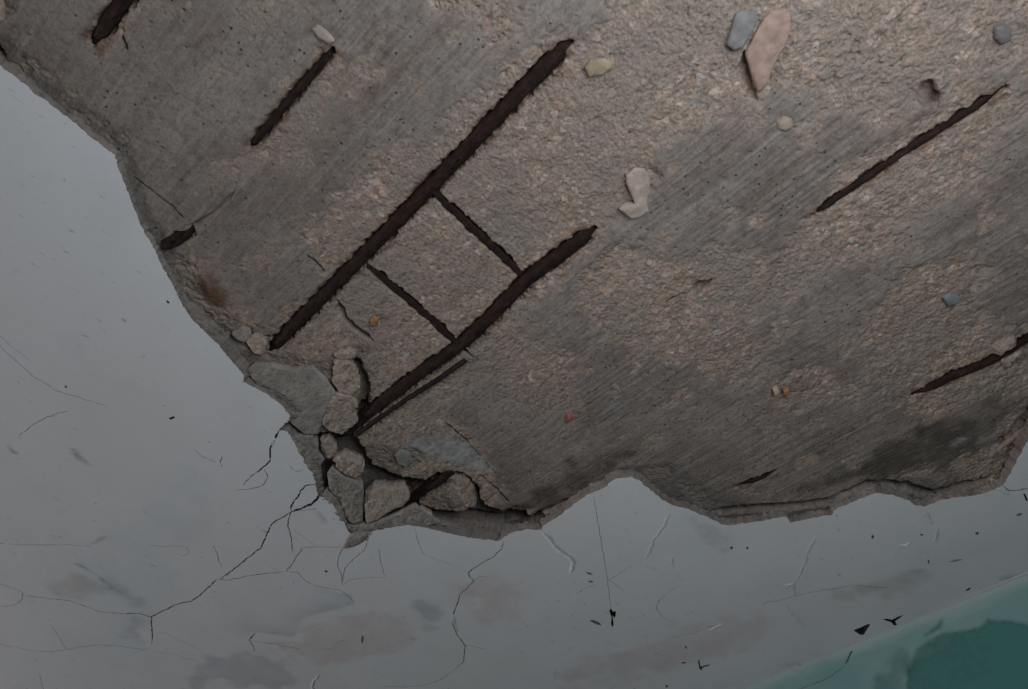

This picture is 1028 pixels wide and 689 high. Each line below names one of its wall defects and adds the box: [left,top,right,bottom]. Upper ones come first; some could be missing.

spalling [0,0,1028,541]
crack [0,336,108,436]
crack [445,422,499,477]
crack [1,431,385,689]
crack [390,530,503,687]